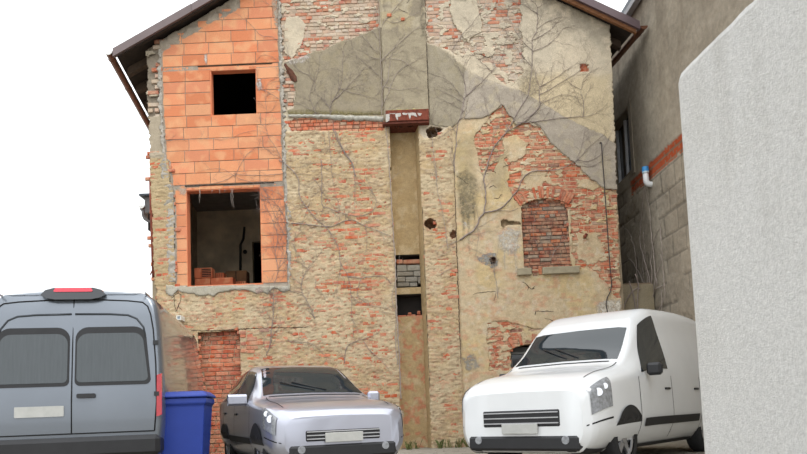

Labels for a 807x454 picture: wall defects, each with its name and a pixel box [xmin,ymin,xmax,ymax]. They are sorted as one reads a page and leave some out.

spalling [276,0,380,110]
spalling [425,0,525,87]
spalling [285,113,422,132]
spalling [474,106,621,298]
peeling [165,282,290,297]
spalling [486,320,542,371]